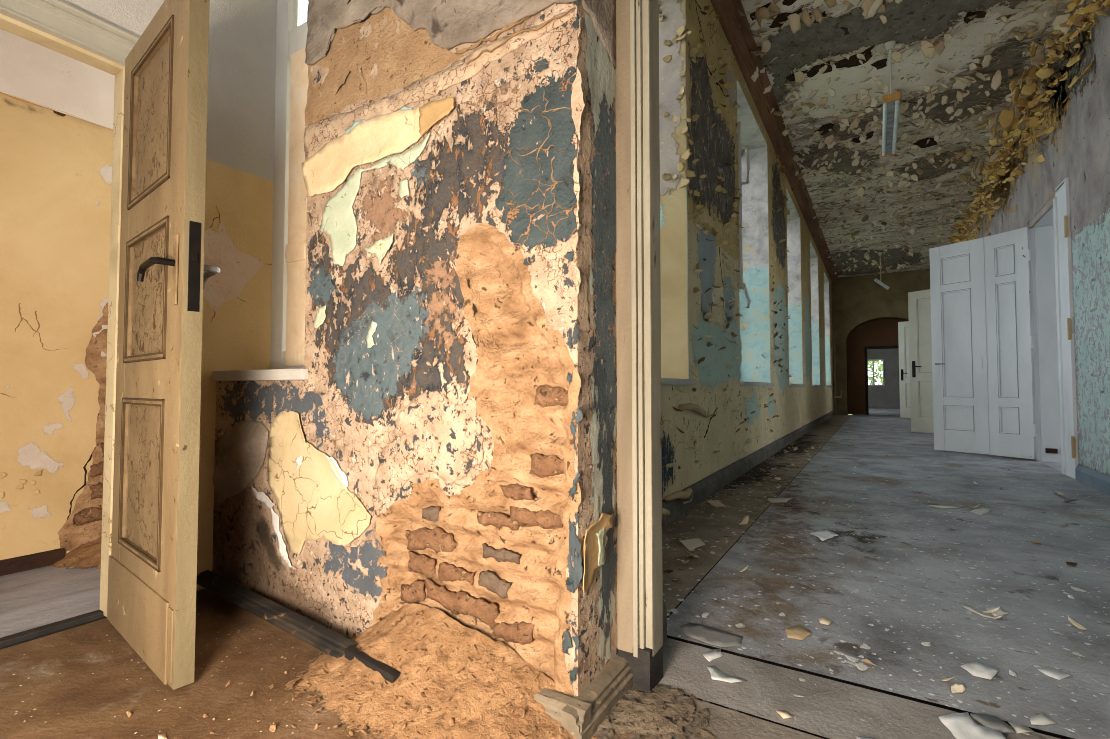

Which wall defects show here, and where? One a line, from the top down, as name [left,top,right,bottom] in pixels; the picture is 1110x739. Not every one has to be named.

spalling [305,6,467,127]
peeling [534,59,549,73]
peeling [0,441,64,519]
crack [15,303,67,351]
spalling [43,299,108,551]
peeling [302,97,454,328]
spalling [251,223,613,697]
peeling [659,0,779,519]
peeling [738,0,1110,377]